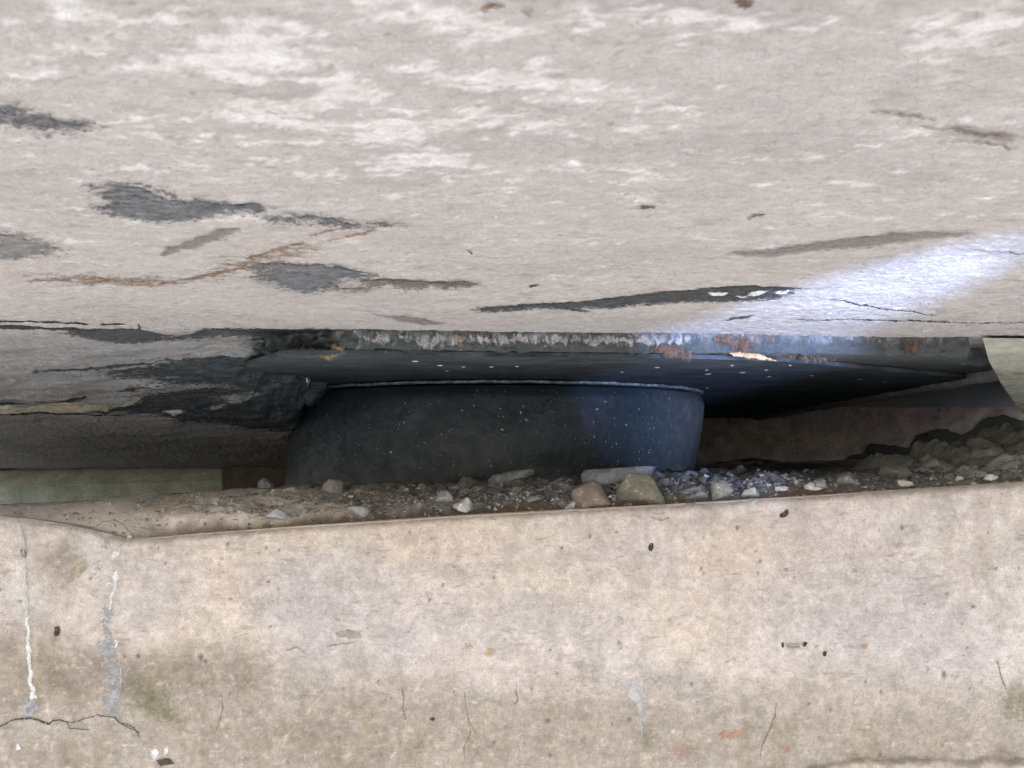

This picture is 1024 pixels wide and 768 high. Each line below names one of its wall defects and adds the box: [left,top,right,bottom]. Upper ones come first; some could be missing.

rust [23,228,378,290]
peeling [0,324,370,432]
rust [650,341,692,361]
rust [705,334,836,363]
damp [17,523,39,717]
damp [93,537,122,715]
crack [0,714,140,738]